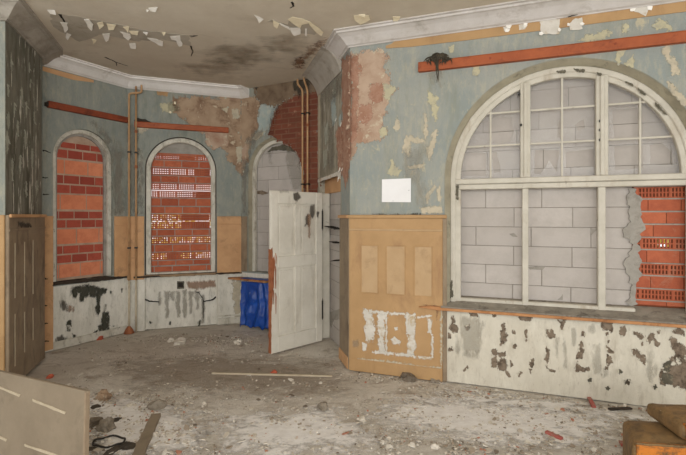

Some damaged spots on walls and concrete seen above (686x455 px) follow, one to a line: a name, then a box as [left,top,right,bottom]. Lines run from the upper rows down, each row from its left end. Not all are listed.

peeling [48,10,191,49]
peeling [539,18,612,42]
peeling [615,50,635,68]
peeling [661,45,686,107]
peeling [157,48,400,193]
peeling [419,185,444,215]
spalling [447,313,478,353]
spalling [491,316,534,377]
spalling [544,319,566,373]
spalling [575,331,592,384]
spalling [600,322,661,387]
spalling [654,328,686,390]